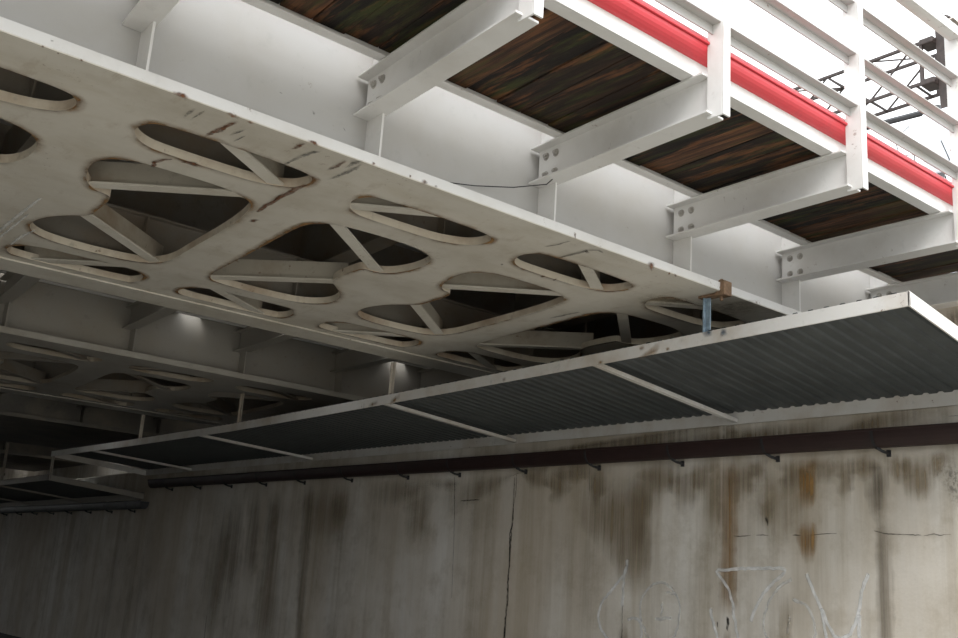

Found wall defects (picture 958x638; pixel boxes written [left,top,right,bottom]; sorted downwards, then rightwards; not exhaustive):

crack [503,475,517,638]
rust [710,473,735,596]
rust [800,469,814,499]
crack [876,529,951,537]